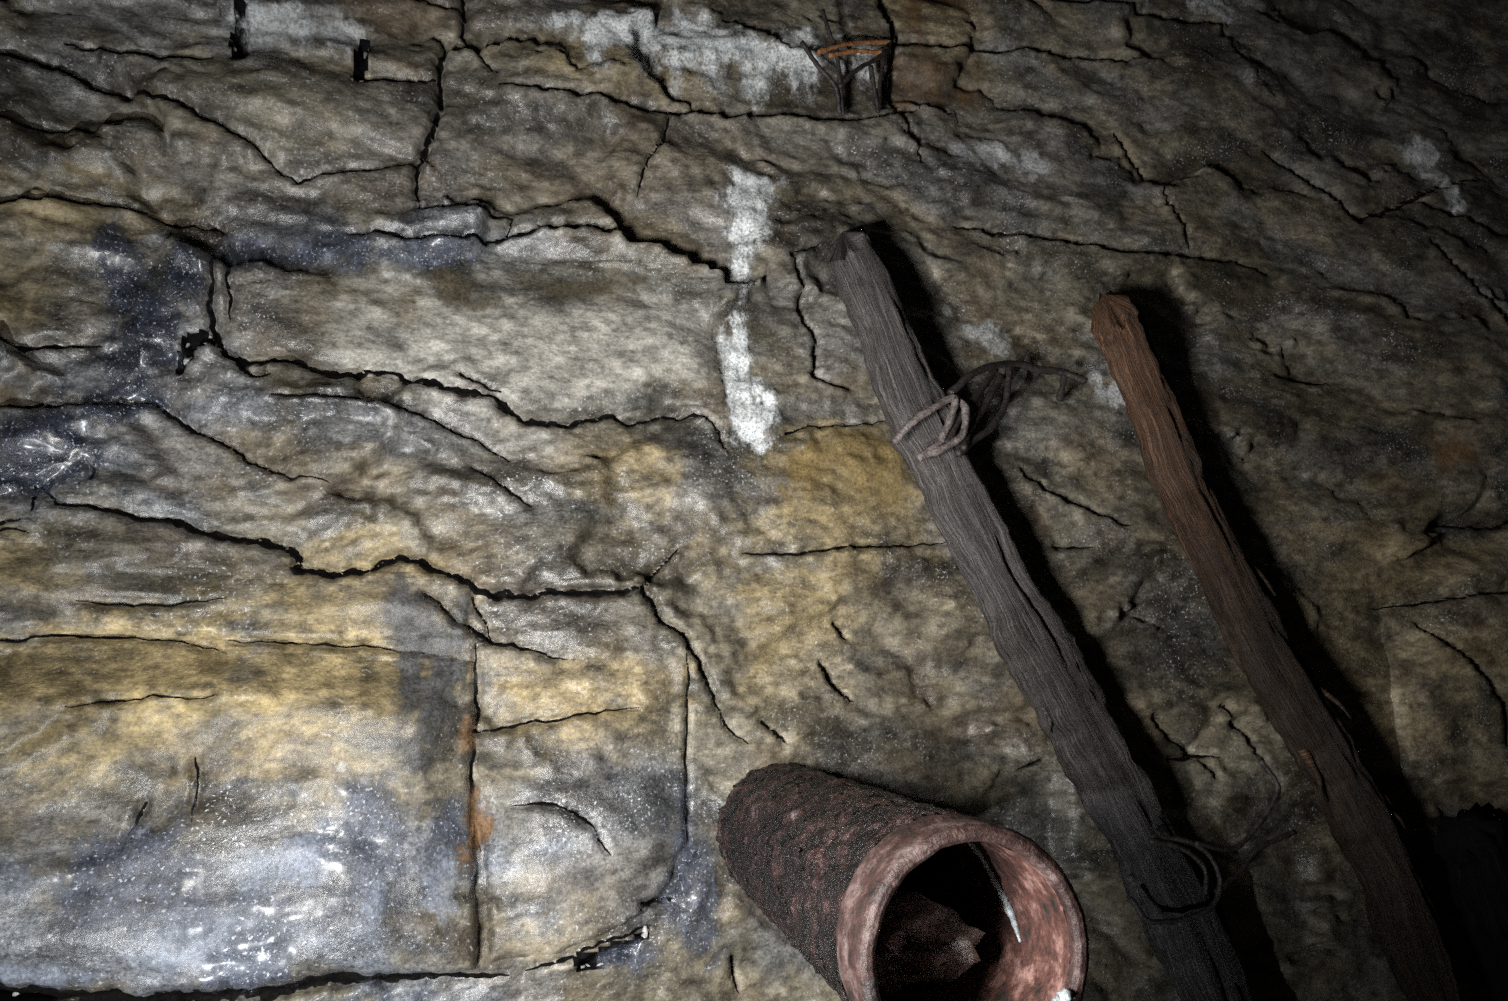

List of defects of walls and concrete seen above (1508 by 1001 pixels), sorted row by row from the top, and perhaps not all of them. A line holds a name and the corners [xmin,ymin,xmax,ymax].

crack [2,0,751,246]
leakage [547,8,872,98]
crack [850,0,1142,163]
crack [0,198,728,510]
leakage [716,163,786,455]
crack [785,242,885,435]
crack [741,542,946,556]
crack [0,461,787,840]
crack [818,624,853,702]
crack [1151,705,1260,779]
crack [512,801,611,855]
crack [0,897,673,1001]